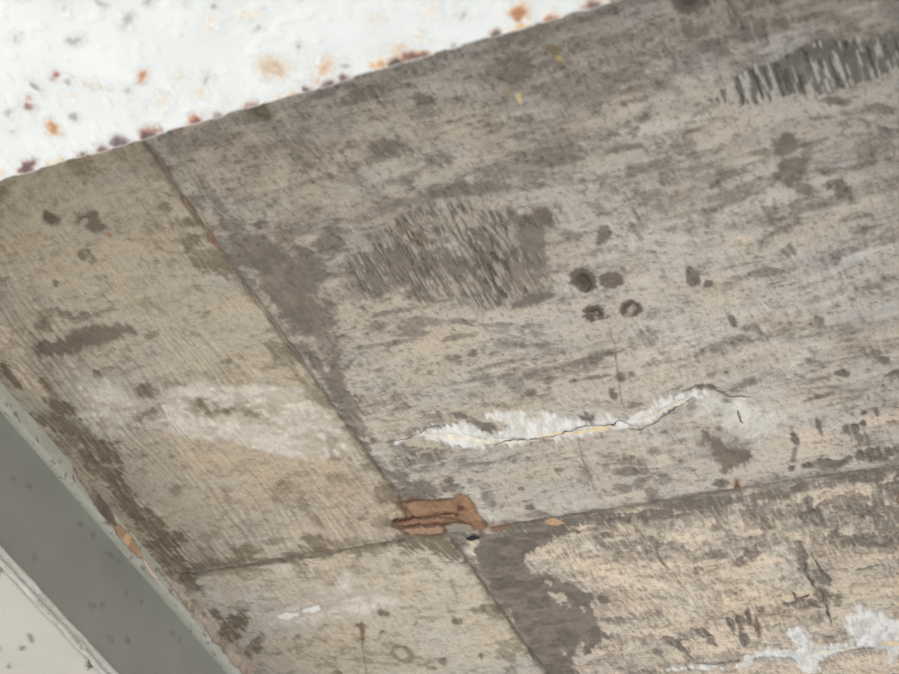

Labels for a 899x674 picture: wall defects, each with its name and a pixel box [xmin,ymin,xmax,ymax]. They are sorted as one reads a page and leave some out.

rust [484,0,565,38]
rust [576,0,619,11]
rust [47,66,62,84]
rust [132,65,154,88]
rust [238,47,354,110]
rust [365,37,434,72]
rust [17,91,67,140]
rust [181,107,228,127]
rust [0,121,172,181]
crack [384,329,798,494]
peeling [385,492,604,674]
crack [665,552,899,674]